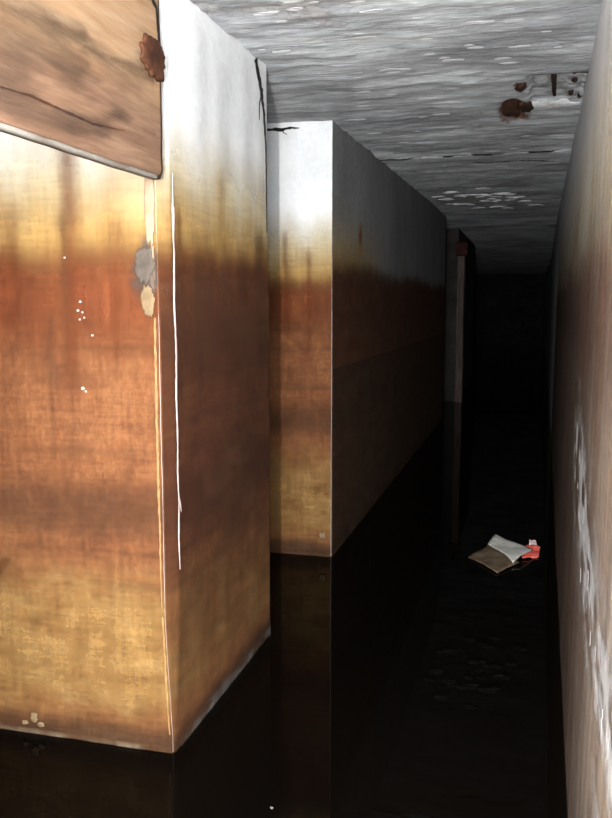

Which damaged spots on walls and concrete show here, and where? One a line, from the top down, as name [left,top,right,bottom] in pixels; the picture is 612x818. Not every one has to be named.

spalling [133,177,171,735]
damp [551,184,612,818]